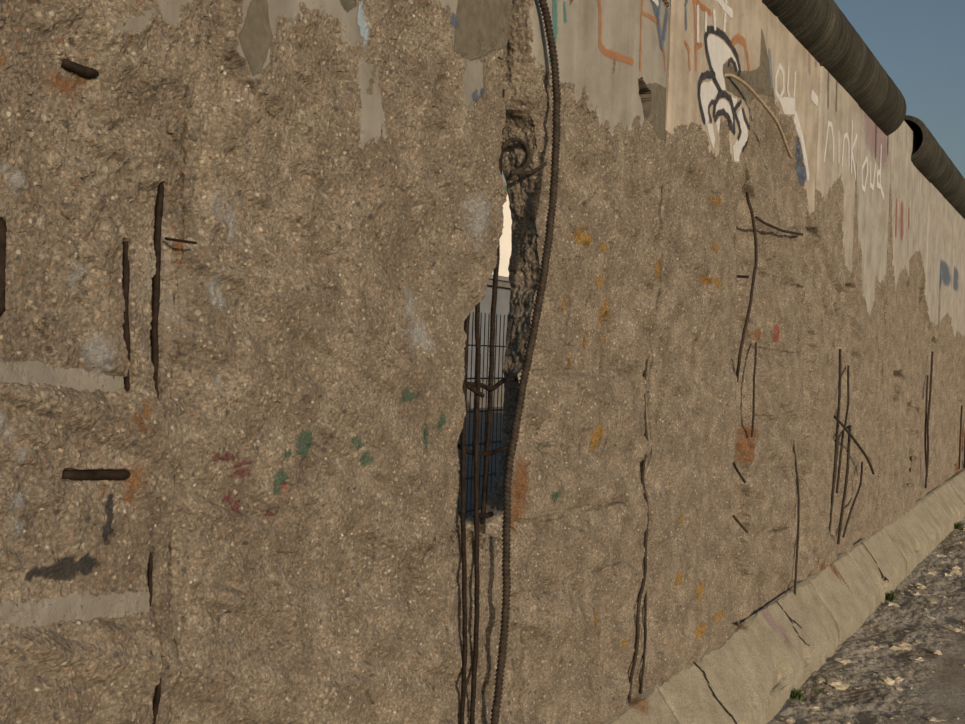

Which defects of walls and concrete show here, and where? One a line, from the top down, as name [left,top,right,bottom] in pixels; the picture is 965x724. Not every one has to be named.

spalling [0,0,553,724]
spalling [459,0,965,724]
crack [693,662,737,724]